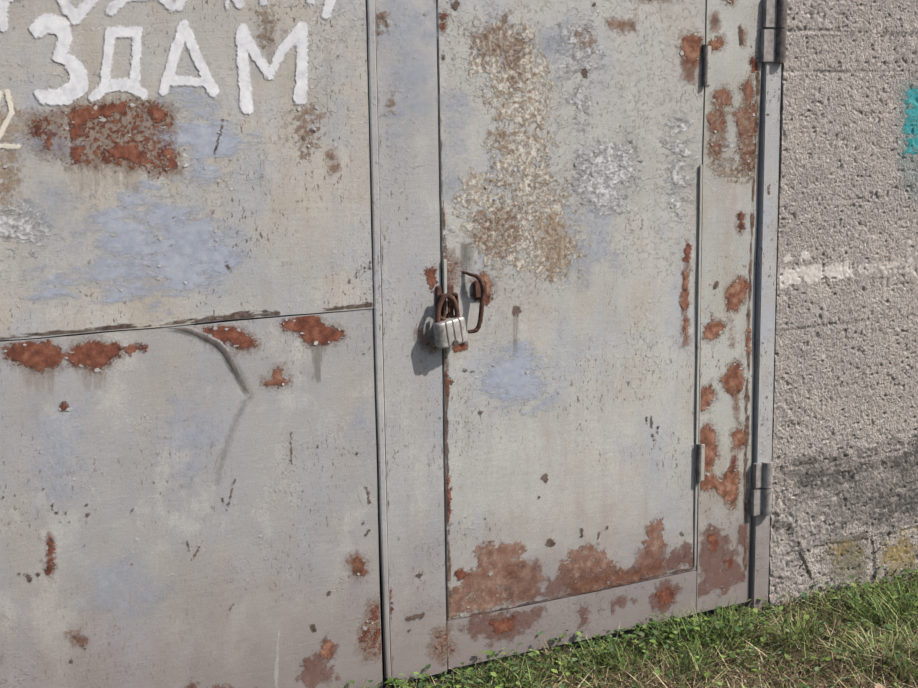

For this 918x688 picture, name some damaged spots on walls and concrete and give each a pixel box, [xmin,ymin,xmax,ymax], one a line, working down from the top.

corrosion [415,57,761,646]